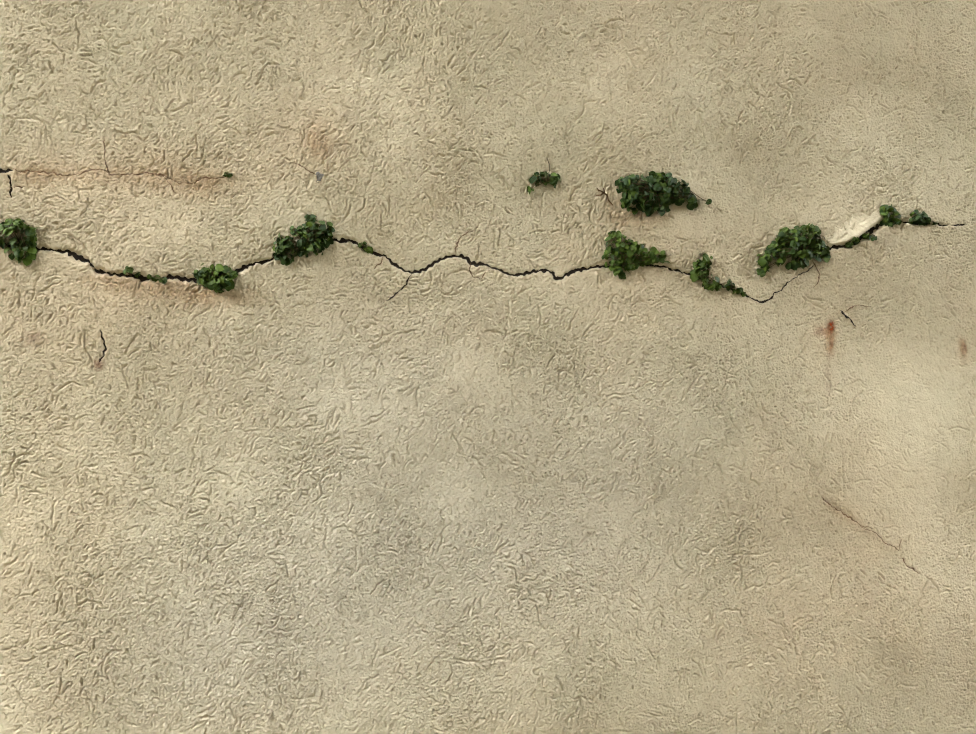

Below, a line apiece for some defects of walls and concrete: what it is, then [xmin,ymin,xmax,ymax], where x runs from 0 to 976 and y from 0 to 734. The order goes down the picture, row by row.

crack [0,140,227,197]
crack [5,243,207,283]
crack [234,253,291,273]
crack [333,231,691,301]
crack [719,221,965,303]